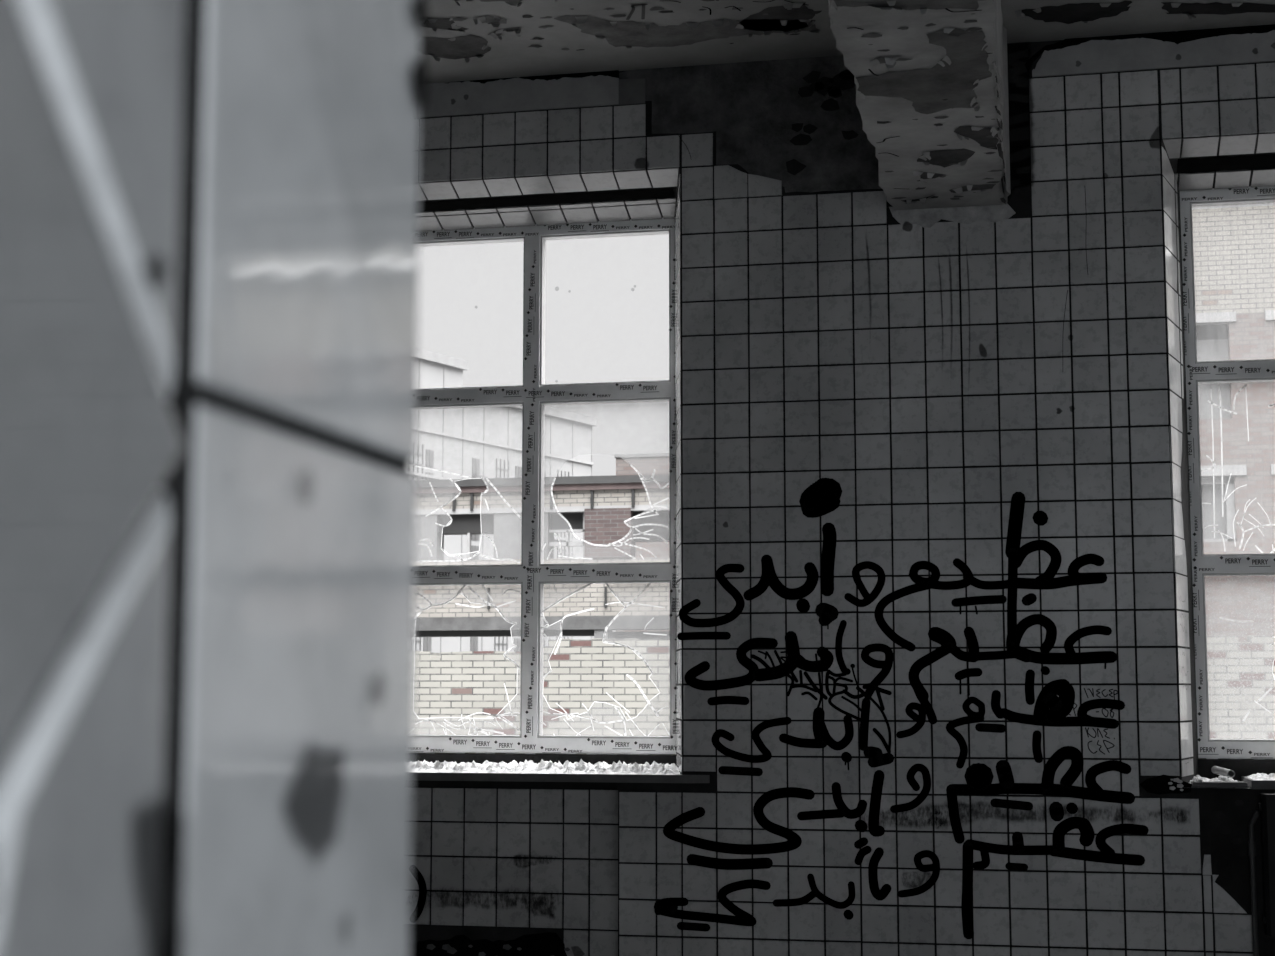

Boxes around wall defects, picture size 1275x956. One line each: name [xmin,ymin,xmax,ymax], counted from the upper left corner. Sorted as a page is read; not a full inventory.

peeling [1015,0,1136,24]
peeling [1161,2,1275,19]
peeling [412,0,1008,204]